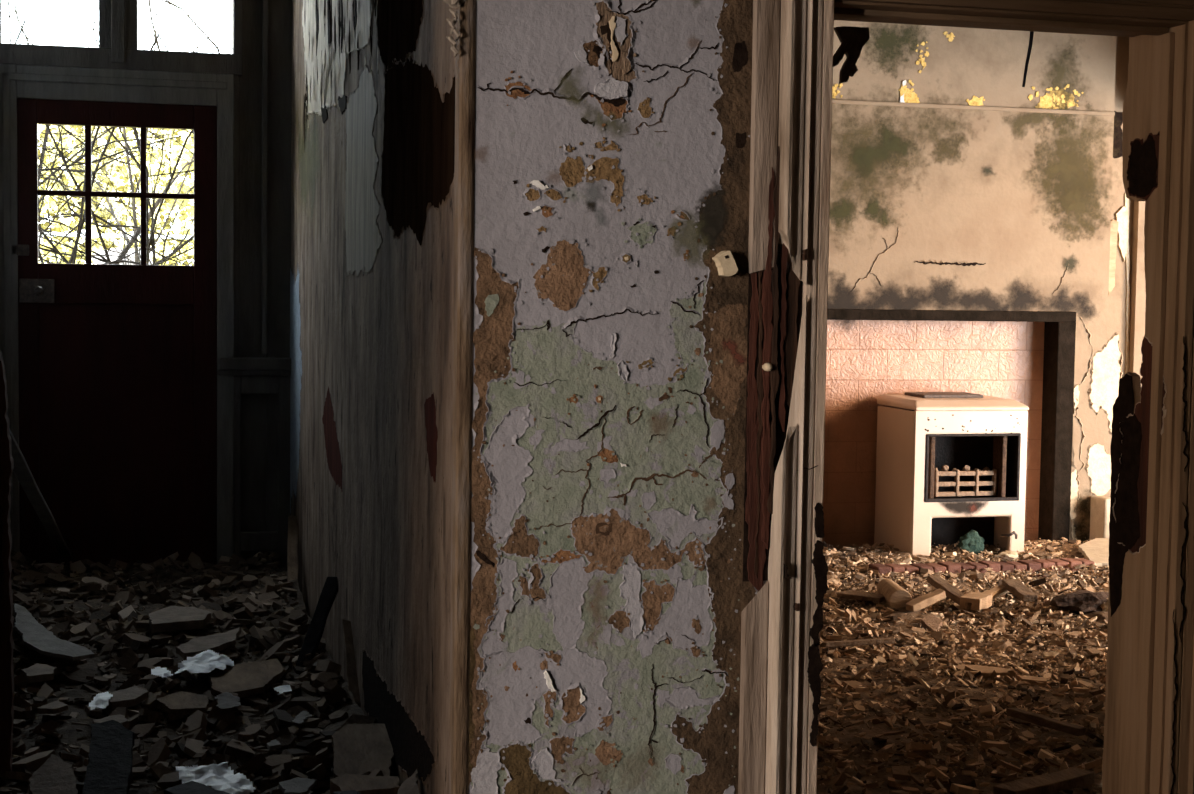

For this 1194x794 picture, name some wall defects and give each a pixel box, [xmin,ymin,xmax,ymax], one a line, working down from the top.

peeling [302,0,455,278]
crack [478,68,606,101]
crack [626,40,718,136]
water stain [866,23,924,72]
mould [830,101,963,229]
peeling [1028,84,1083,110]
mould [1006,50,1108,237]
crack [852,229,986,291]
water stain [1063,257,1077,271]
crack [538,378,720,530]
peeling [469,0,803,794]
peeling [1070,313,1123,543]